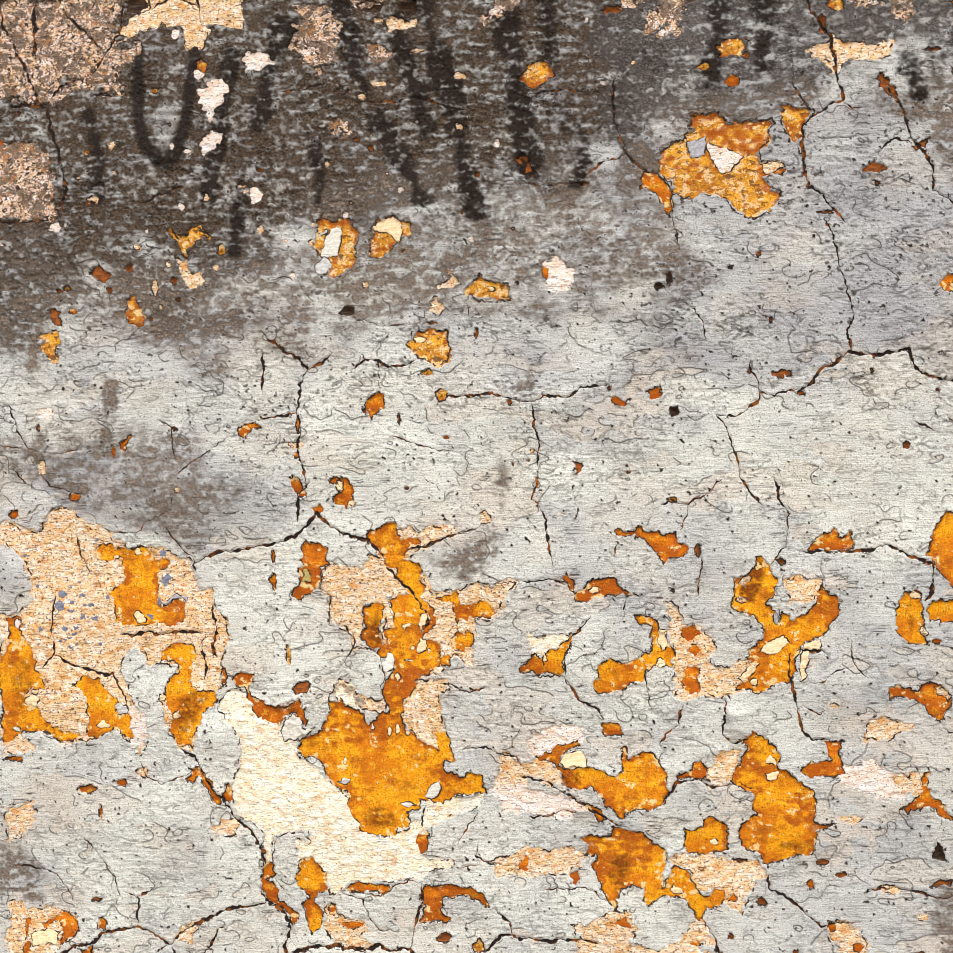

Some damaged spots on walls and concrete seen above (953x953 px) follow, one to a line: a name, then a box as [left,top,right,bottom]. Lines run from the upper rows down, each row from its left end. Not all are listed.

damp [0,0,953,374]
peeling [639,103,815,220]
crack [661,0,953,601]
damp [0,379,240,545]
crack [113,332,484,632]
damp [495,466,509,496]
crack [448,384,604,585]
peeling [0,607,134,762]
peeling [141,521,517,944]
peeling [593,556,840,699]
crack [62,749,512,953]
peeling [535,722,845,952]